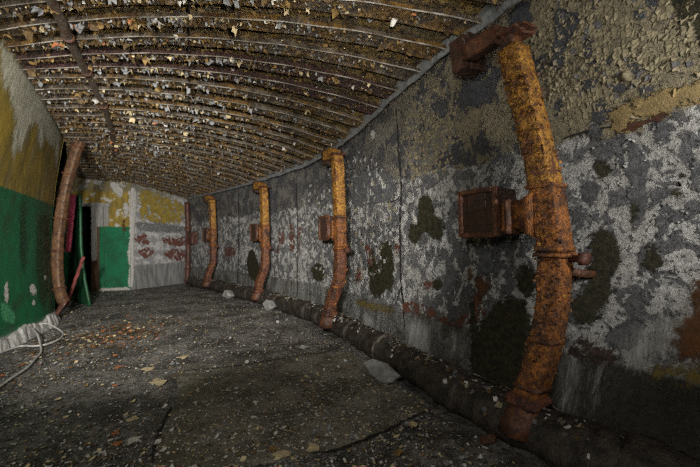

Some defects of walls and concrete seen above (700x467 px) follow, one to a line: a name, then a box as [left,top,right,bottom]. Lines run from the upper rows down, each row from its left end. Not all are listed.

peeling [0,0,462,291]
peeling [524,0,700,230]
damp [247,250,260,282]
damp [311,263,326,281]
damp [367,241,394,298]
damp [408,195,445,246]
damp [570,225,622,325]
damp [469,265,536,389]
rust [649,280,700,388]
crack [310,409,431,454]